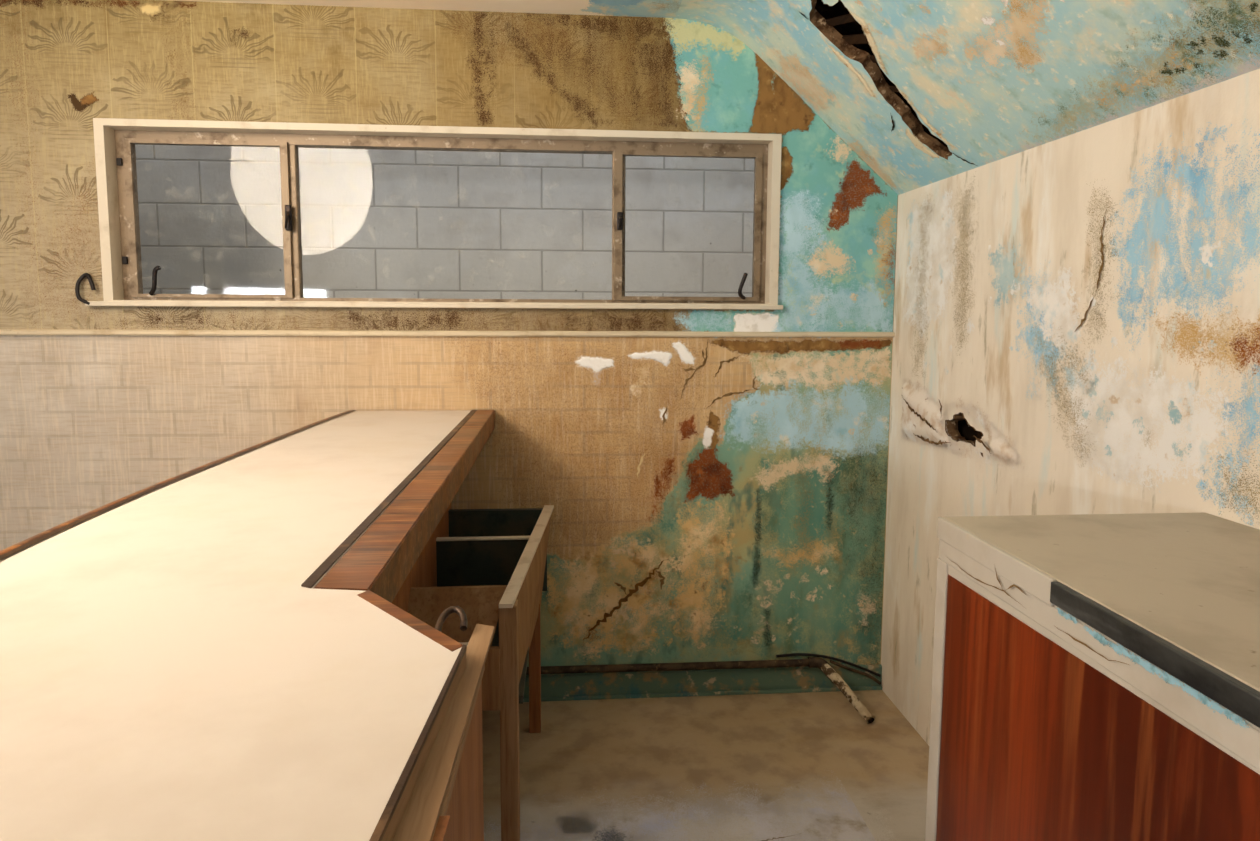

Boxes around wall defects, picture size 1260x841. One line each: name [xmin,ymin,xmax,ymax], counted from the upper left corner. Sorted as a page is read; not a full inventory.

crack [800,0,977,166]
peeling [980,53,1260,165]
damp [1020,0,1260,148]
peeling [527,0,992,675]
corrosion [1146,306,1260,380]
crack [583,559,668,643]